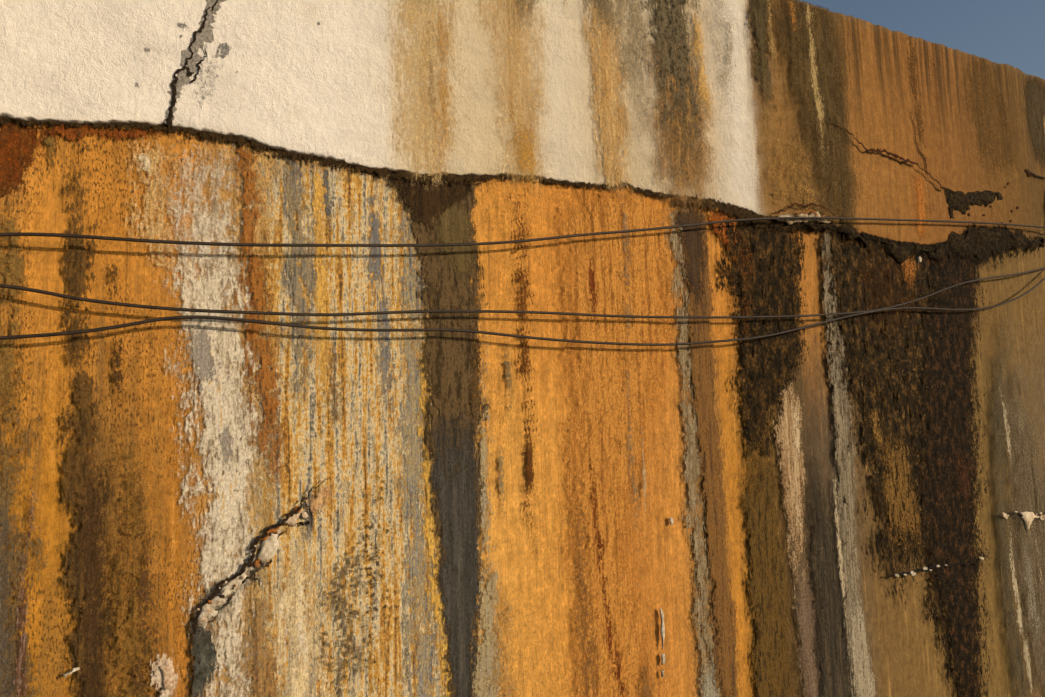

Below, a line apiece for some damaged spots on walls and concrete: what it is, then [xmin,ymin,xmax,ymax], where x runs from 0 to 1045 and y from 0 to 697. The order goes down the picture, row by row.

corrosion [0,120,164,205]
leakage [0,129,171,697]
crack [164,0,238,126]
crack [180,478,336,697]
leakage [125,0,533,697]
leakage [480,0,543,553]
corrosion [554,186,674,697]
leakage [581,0,1045,697]
crack [829,111,947,190]
crack [1024,169,1045,179]